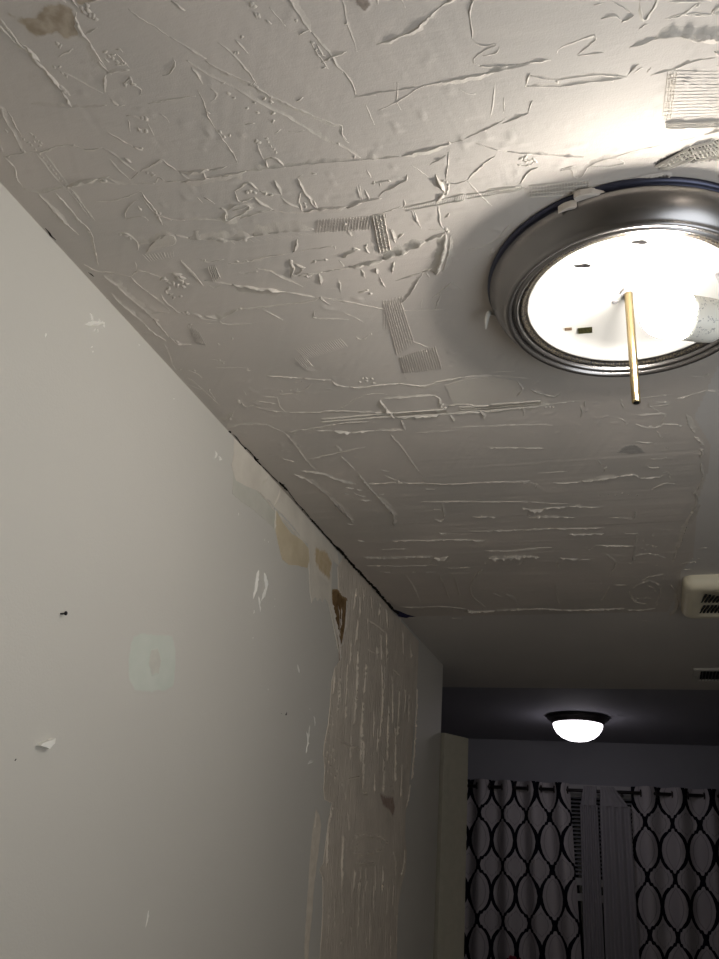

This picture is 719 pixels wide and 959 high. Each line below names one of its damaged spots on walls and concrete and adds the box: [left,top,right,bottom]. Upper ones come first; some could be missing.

peeling [4,0,101,45]
spalling [351,0,379,15]
crack [229,431,399,614]
spalling [330,589,347,661]